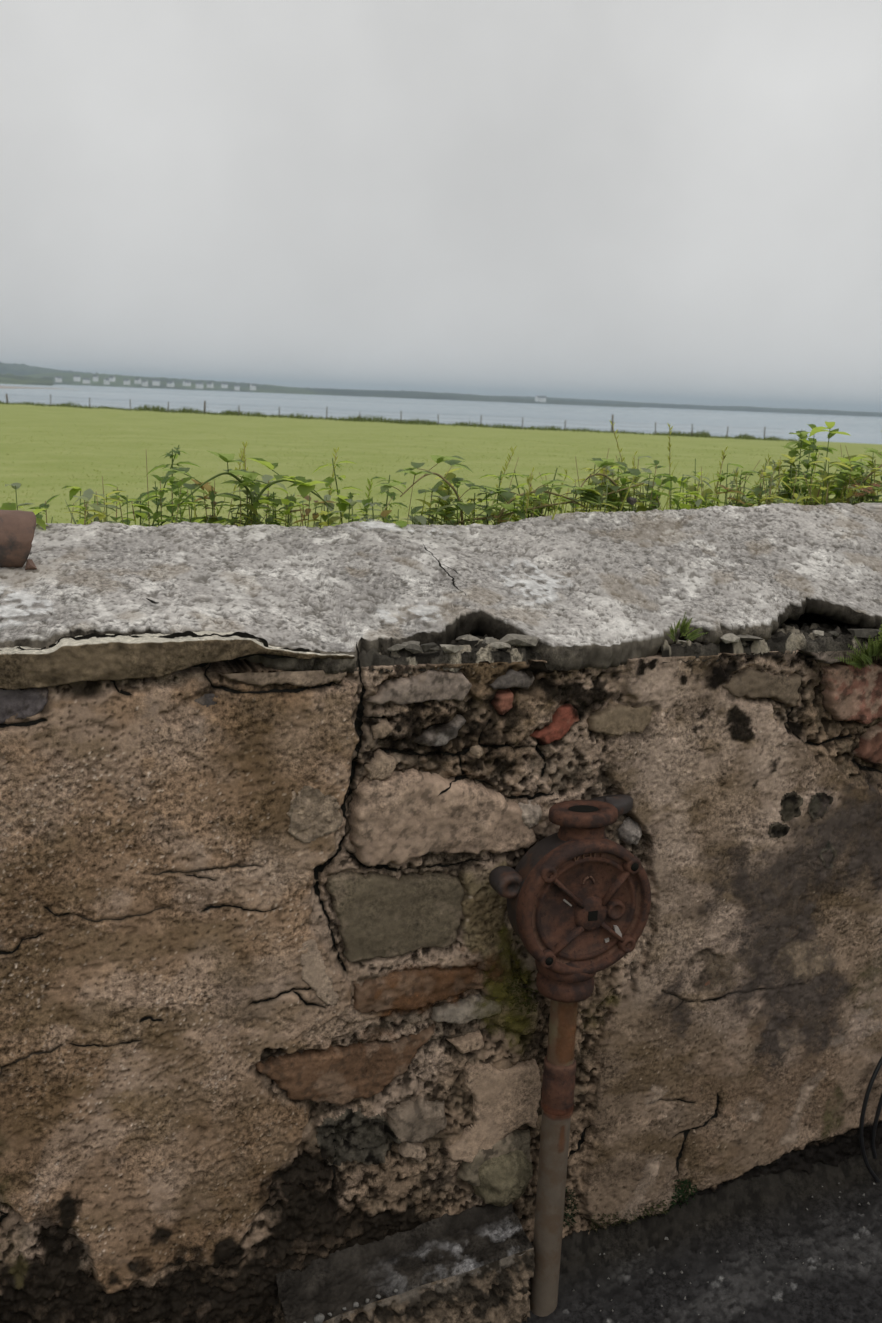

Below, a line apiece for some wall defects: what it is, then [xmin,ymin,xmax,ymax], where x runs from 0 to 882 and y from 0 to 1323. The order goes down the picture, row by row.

spalling [355,633,542,674]
spalling [661,623,882,663]
peeling [364,718,396,780]
crack [0,631,554,975]
damp [705,781,882,1066]
crack [251,988,325,1008]
crack [664,988,764,1014]
crack [0,1016,162,1075]
peeling [446,1030,541,1163]
spalling [315,1108,427,1166]
crack [647,1093,719,1178]
damp [0,1150,432,1323]